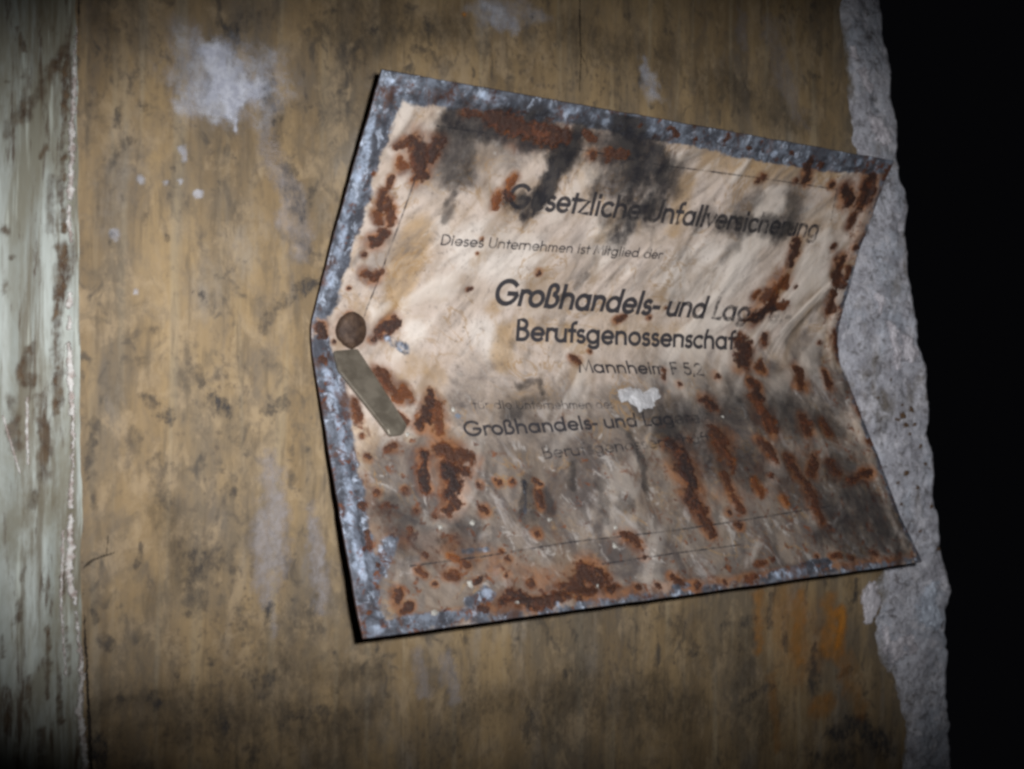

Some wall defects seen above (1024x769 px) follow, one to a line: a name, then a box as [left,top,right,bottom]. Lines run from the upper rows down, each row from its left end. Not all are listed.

damp [198,20,270,131]
peeling [37,46,70,470]
peeling [17,346,37,387]
peeling [7,418,21,449]